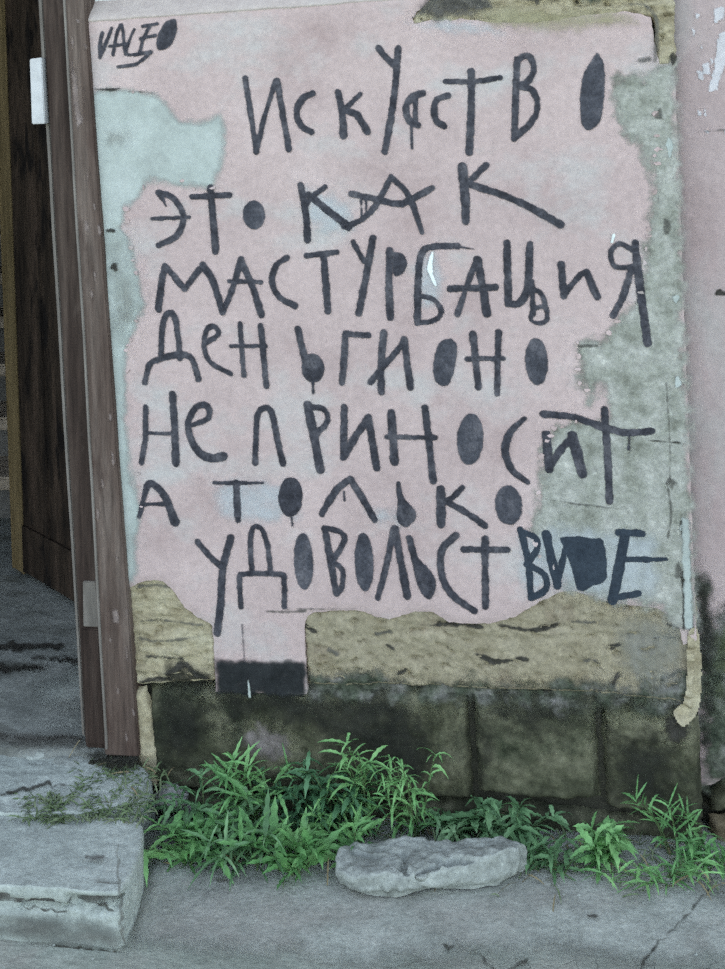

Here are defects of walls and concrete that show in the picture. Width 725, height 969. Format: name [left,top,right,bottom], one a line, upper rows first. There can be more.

peeling [697,7,725,92]
peeling [72,68,81,125]
peeling [85,88,226,684]
peeling [305,0,702,727]
damp [700,585,714,668]
crack [481,956,528,969]
crack [640,890,709,969]